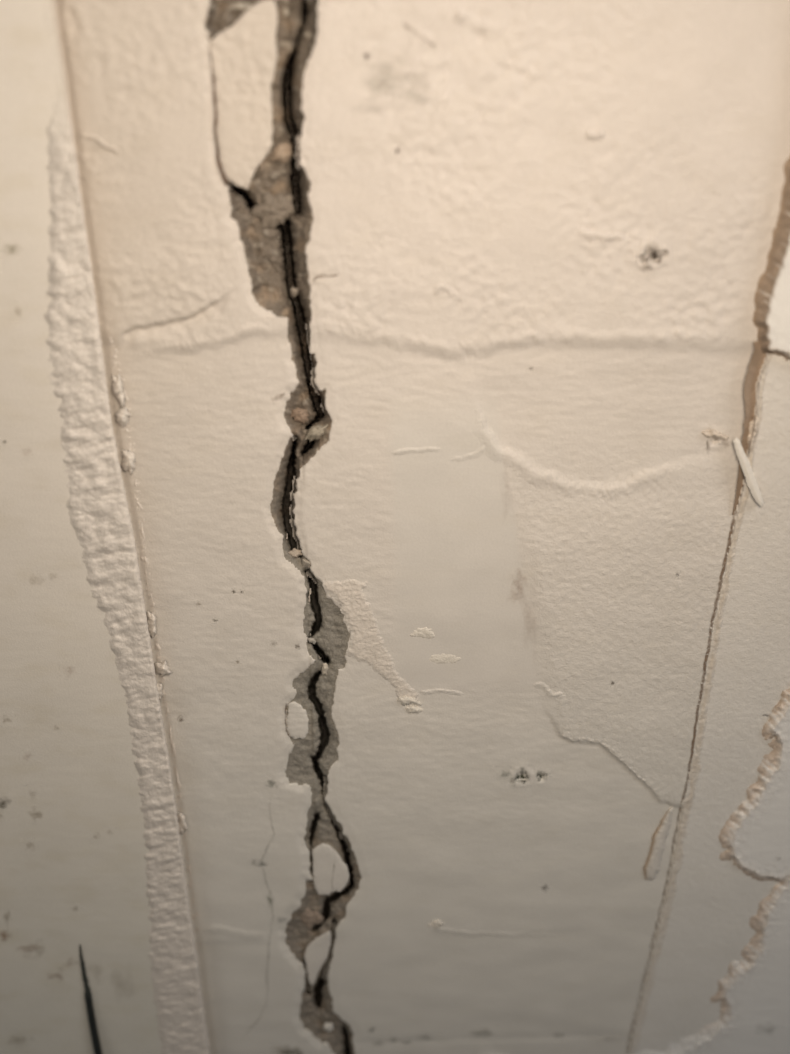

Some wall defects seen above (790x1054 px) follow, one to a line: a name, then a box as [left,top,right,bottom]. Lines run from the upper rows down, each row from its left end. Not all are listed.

crack [204,0,362,1054]
spalling [322,579,420,707]
crack [629,341,773,1054]